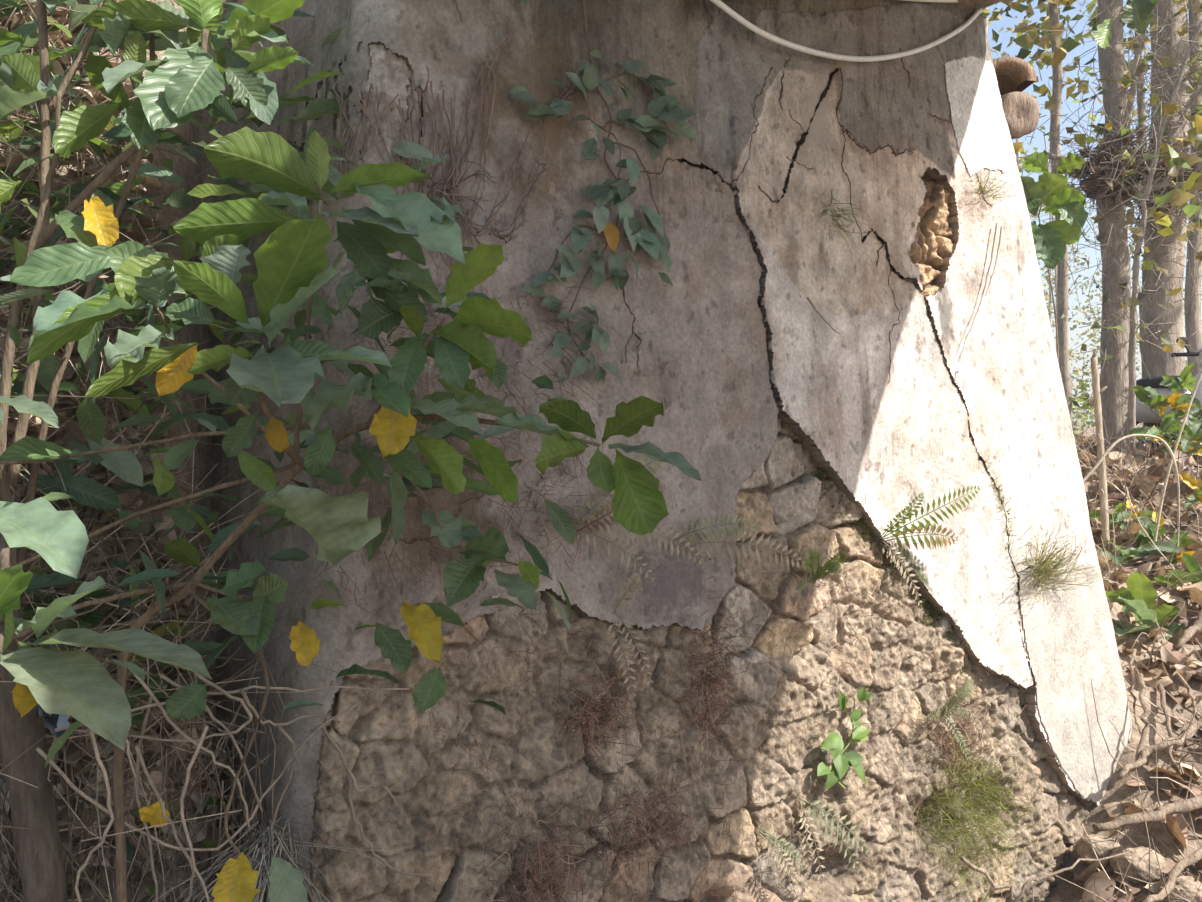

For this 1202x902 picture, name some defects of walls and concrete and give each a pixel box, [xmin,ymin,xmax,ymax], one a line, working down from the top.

crack [571,71,701,181]
crack [899,48,911,88]
crack [929,107,954,126]
crack [730,55,930,383]
flaking render [905,161,954,295]
crack [622,287,642,369]
flaking render [309,416,1094,902]